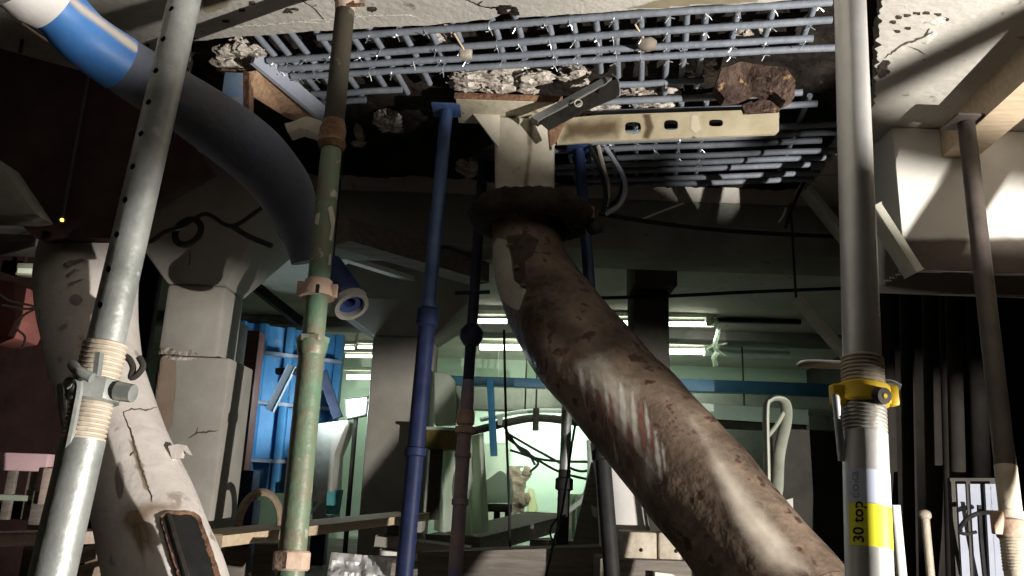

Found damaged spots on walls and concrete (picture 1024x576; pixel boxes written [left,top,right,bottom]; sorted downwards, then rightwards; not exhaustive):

spalling [191,31,333,102]
spalling [254,99,321,176]
spalling [340,0,837,191]
corrosion [712,61,795,115]
spalling [866,0,890,89]
crack [124,407,157,500]